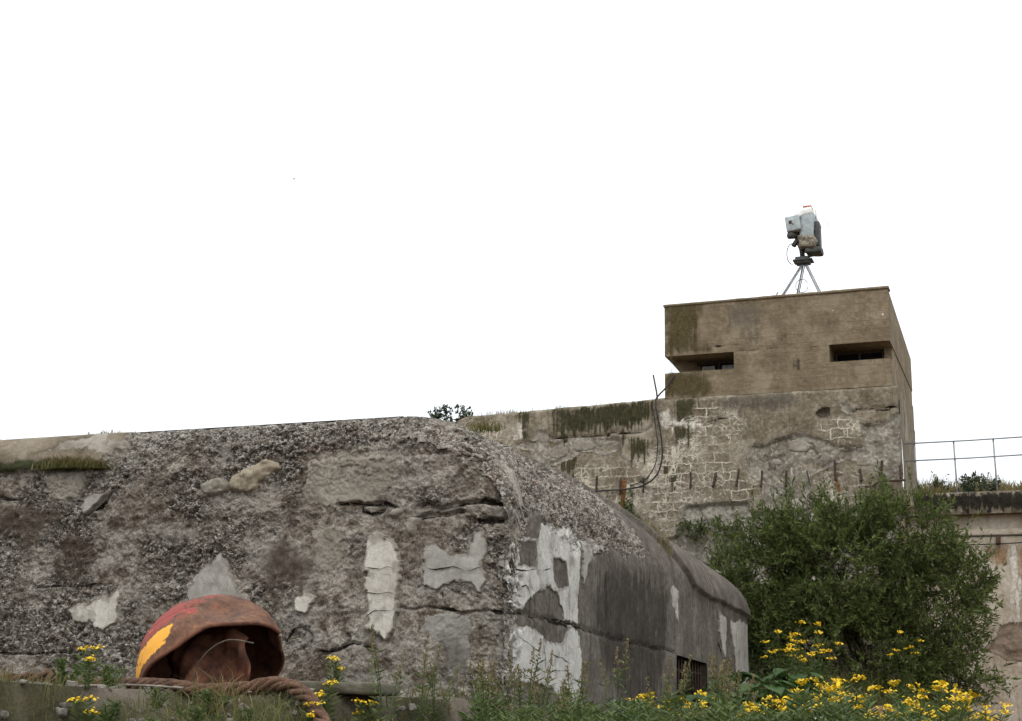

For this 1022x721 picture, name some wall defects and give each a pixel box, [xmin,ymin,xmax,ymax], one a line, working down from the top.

leakage [481,422,527,448]
leakage [552,400,759,536]
flaking render [69,590,121,631]
flaking render [187,553,242,600]
flaking render [362,532,404,642]
flaking render [420,523,606,706]